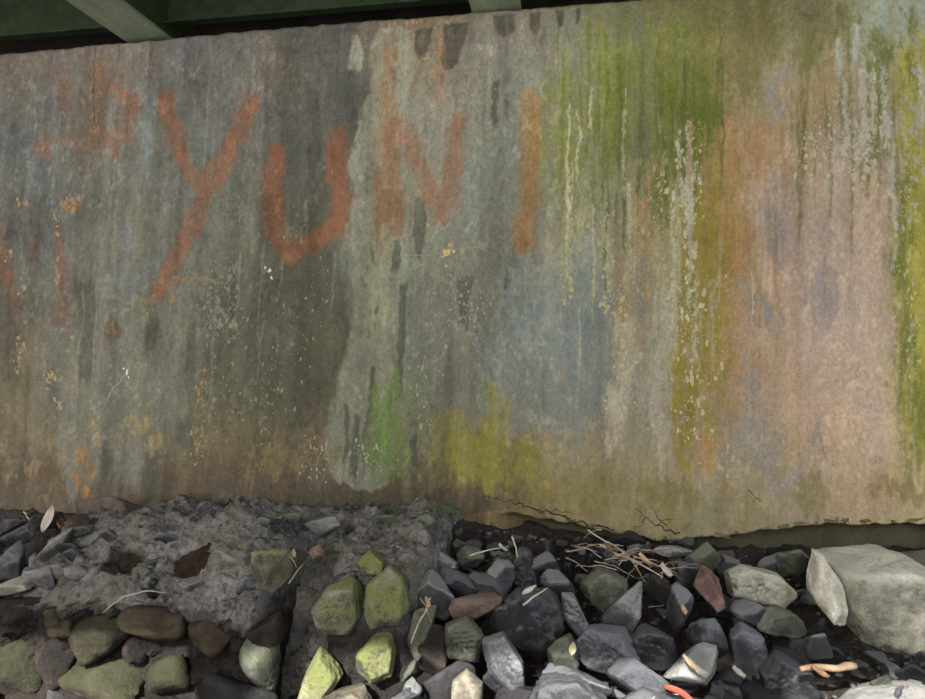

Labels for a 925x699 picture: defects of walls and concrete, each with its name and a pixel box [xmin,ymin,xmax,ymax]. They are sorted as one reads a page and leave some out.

damp [0,7,724,517]
damp [760,163,857,341]
damp [829,0,925,301]
damp [693,265,842,503]
crack [483,496,680,535]